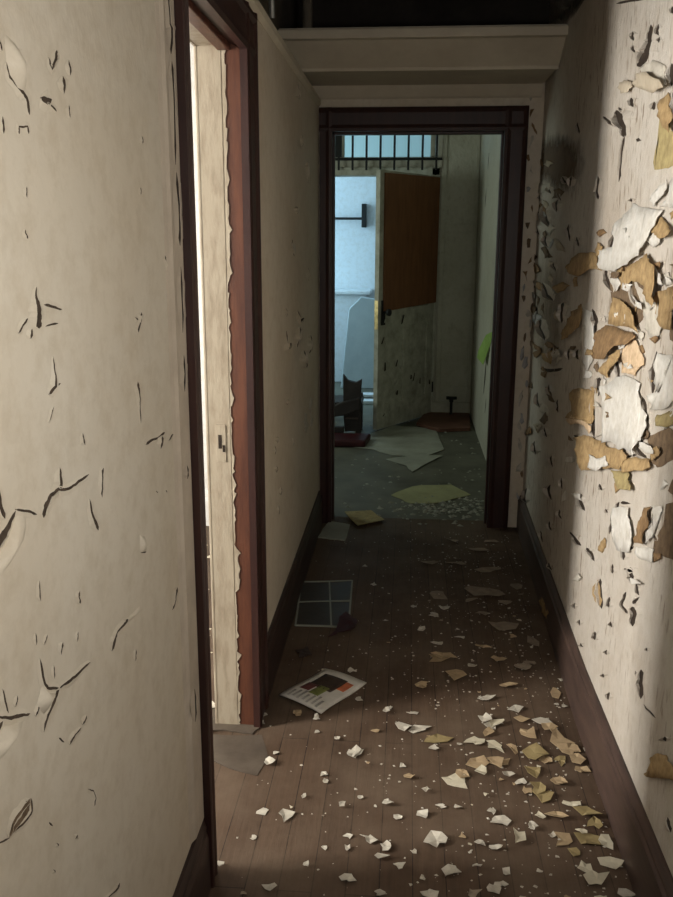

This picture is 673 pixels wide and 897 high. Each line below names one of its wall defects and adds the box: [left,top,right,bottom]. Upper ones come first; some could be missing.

crack [16,286,62,339]
peeling [516,24,673,626]
crack [79,433,87,446]
crack [0,467,106,576]
crack [109,606,141,651]
peeling [578,621,616,647]
crack [0,658,91,759]
peeling [644,753,673,781]